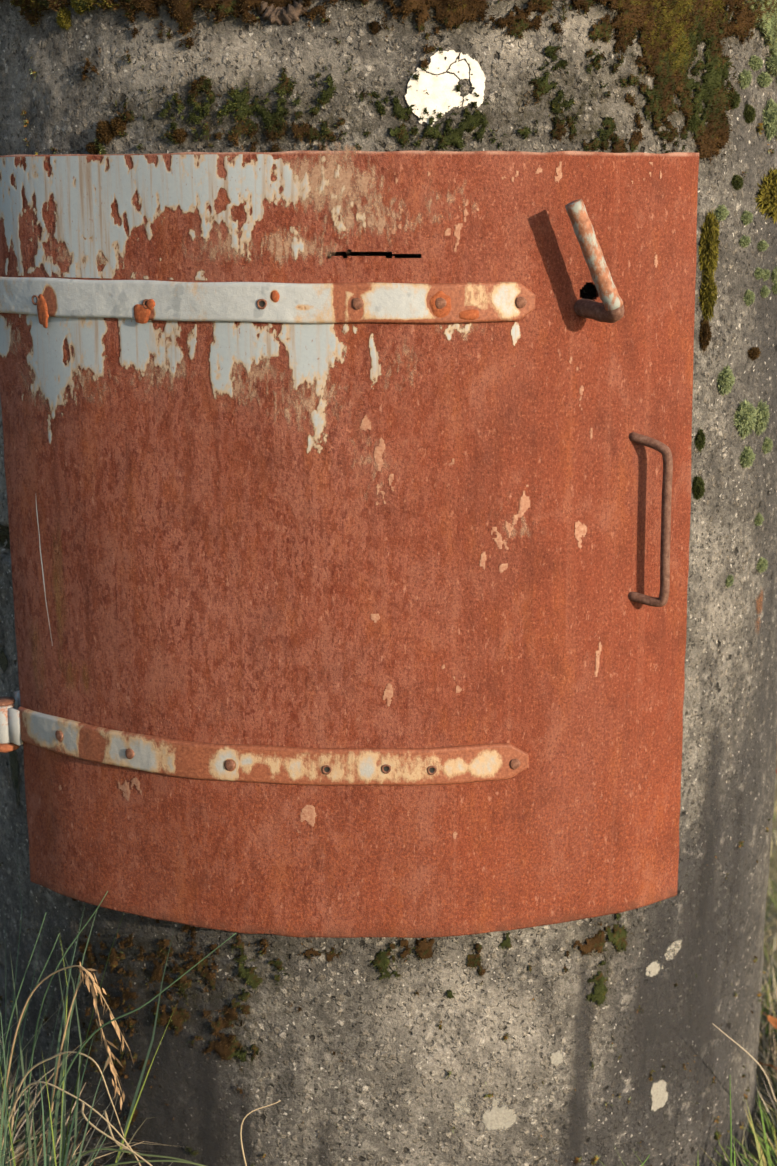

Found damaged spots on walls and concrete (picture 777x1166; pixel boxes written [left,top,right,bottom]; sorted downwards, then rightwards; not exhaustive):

peeling [0,148,408,280]
peeling [436,194,479,252]
rust [37,294,49,328]
rust [133,299,155,324]
rust [429,291,479,320]
peeling [440,323,472,340]
peeling [511,322,521,346]
peeling [0,314,197,444]
peeling [209,321,391,454]
leakage [644,897,713,1086]
leakage [566,970,590,1166]